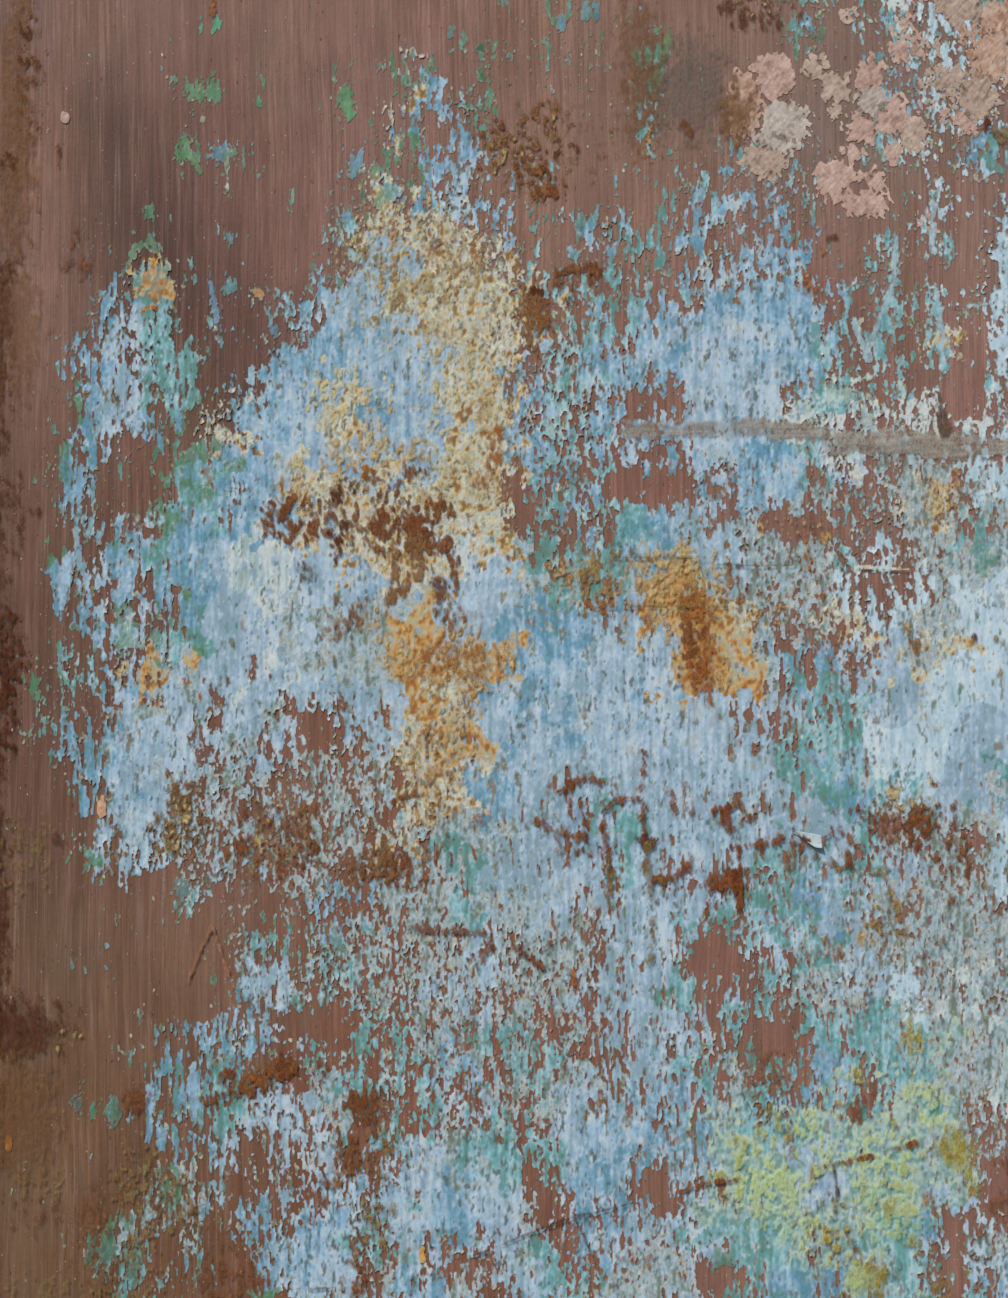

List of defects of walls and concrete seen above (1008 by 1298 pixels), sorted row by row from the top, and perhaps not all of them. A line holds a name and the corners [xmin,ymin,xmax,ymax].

peeling [199,14,223,35]
peeling [160,37,274,199]
peeling [319,57,358,132]
peeling [527,0,611,101]
peeling [613,4,717,159]
peeling [774,0,839,62]
peeling [211,223,252,249]
rust [260,196,608,900]
rust [758,518,831,600]
rust [546,539,785,705]
peeling [111,1043,145,1073]
peeling [63,1073,137,1130]